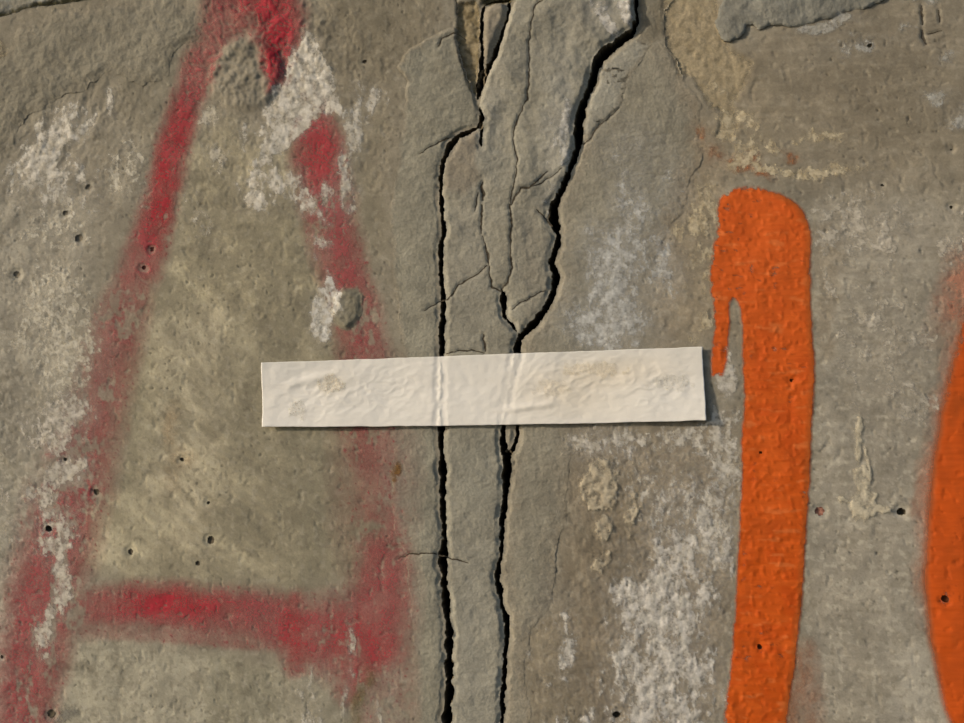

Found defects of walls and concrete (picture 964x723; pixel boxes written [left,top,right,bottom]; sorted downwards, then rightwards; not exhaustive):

crack [420,0,639,357]
peeling [673,183,720,295]
efflorescence [714,347,738,398]
spalling [663,0,863,181]
crack [398,426,468,723]
crack [494,425,520,723]
efflorescence [547,612,575,686]
efflorescence [562,405,743,723]